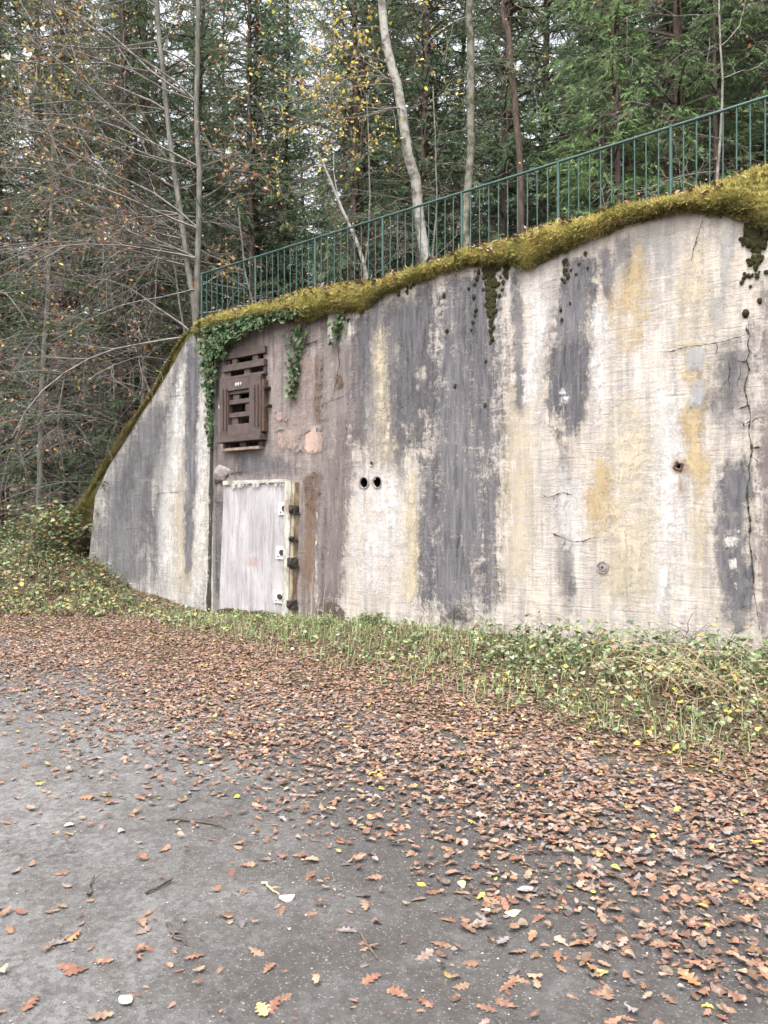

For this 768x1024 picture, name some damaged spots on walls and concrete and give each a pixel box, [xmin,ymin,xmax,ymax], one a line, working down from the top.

water stain [93,337,223,604]
spalling [273,355,323,453]
water stain [314,226,768,633]
crack [664,325,764,631]